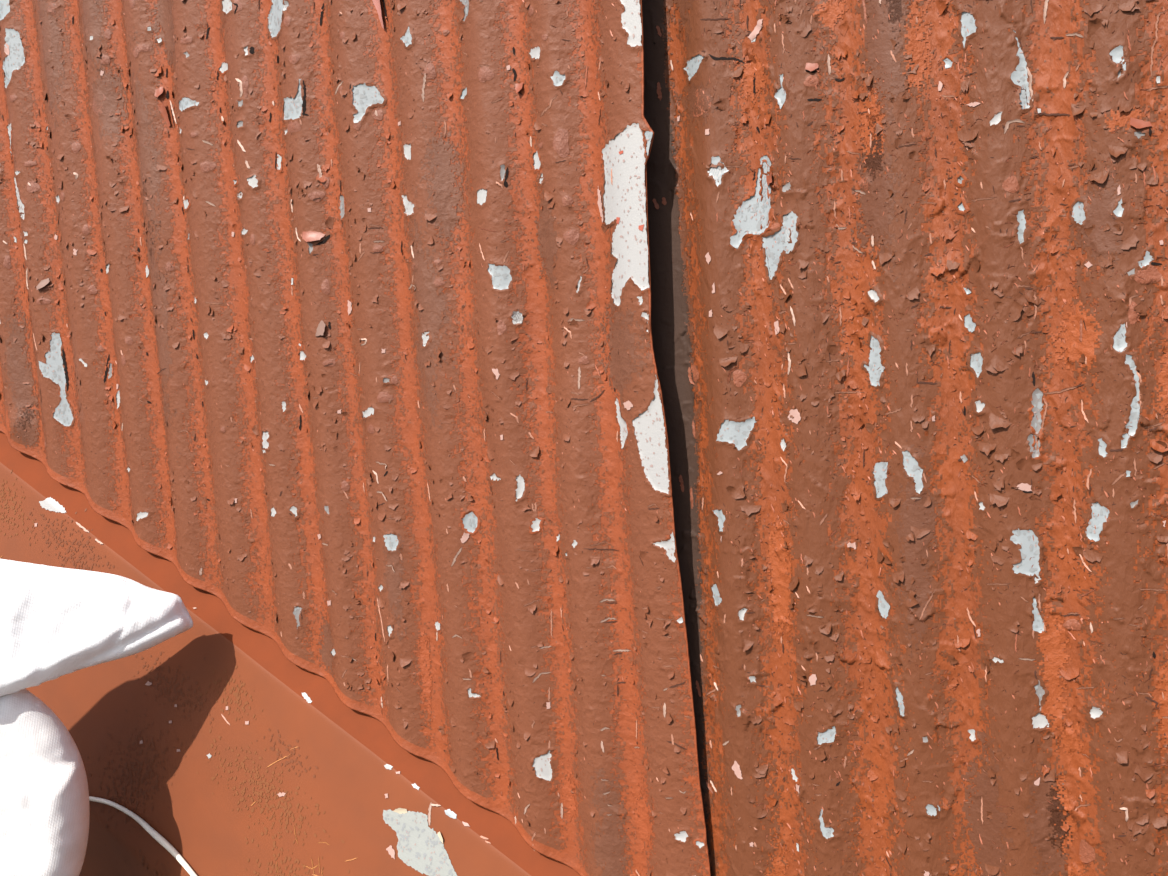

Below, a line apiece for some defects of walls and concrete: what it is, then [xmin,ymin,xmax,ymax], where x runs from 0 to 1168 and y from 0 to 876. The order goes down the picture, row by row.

rust [740,48,766,117]
rust [860,66,886,163]
rust [902,0,934,97]
peeling [591,121,653,344]
peeling [39,332,75,454]
peeling [614,374,671,514]
peeling [683,0,1168,698]
rust [1048,293,1103,371]
rust [762,514,793,657]
peeling [740,554,909,876]
rust [1036,592,1085,757]
peeling [383,804,457,876]